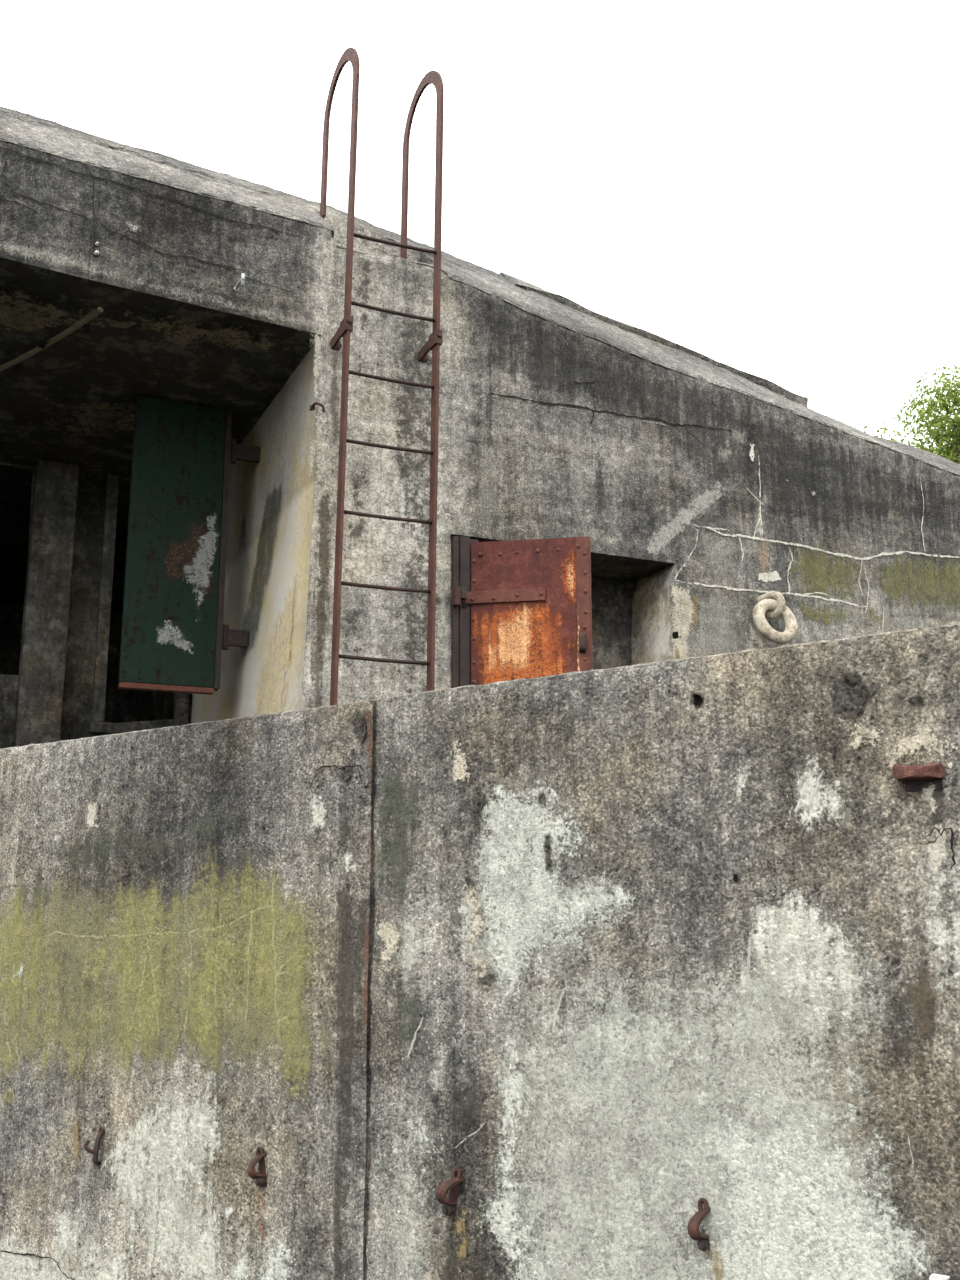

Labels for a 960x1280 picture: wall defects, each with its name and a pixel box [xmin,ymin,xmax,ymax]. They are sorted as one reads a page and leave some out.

crack [0,138,312,296]
crack [484,381,731,445]
peeling [161,514,219,622]
corrosion [562,554,577,602]
crack [675,456,960,633]
peeling [157,620,193,654]
corrosion [473,603,580,685]
water stain [448,739,473,785]
water stain [845,720,958,883]
water stain [0,803,309,1090]
water stain [882,892,939,1079]
crack [0,1251,75,1280]